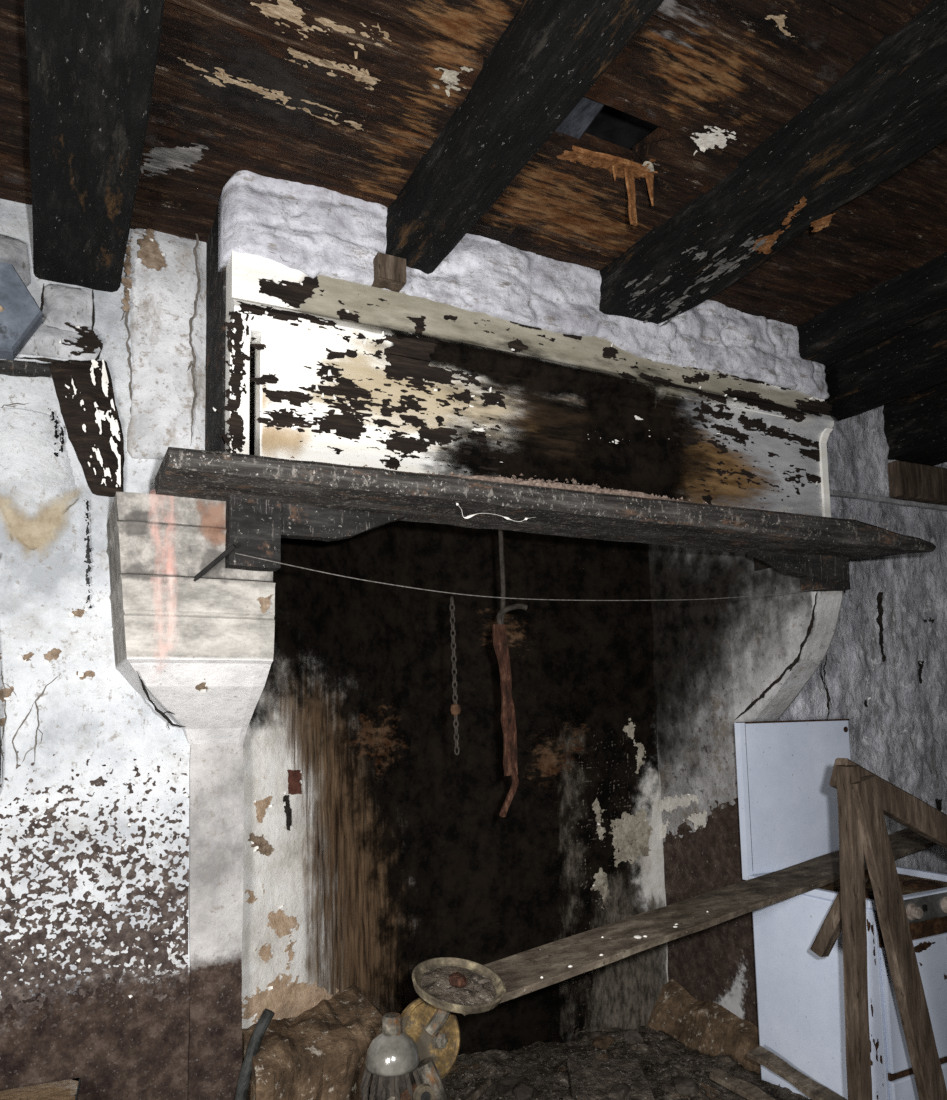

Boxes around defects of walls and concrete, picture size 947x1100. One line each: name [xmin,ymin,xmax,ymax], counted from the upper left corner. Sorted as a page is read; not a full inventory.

peeling [141,143,208,177]
peeling [177,57,365,131]
peeling [250,0,391,90]
peeling [690,126,736,155]
peeling [595,343,832,508]
water stain [0,492,91,552]
water stain [124,511,150,535]
crack [735,591,831,720]
peeling [0,750,189,1036]
peeling [590,794,746,909]
spalling [242,905,339,1024]
peeling [667,912,759,1028]